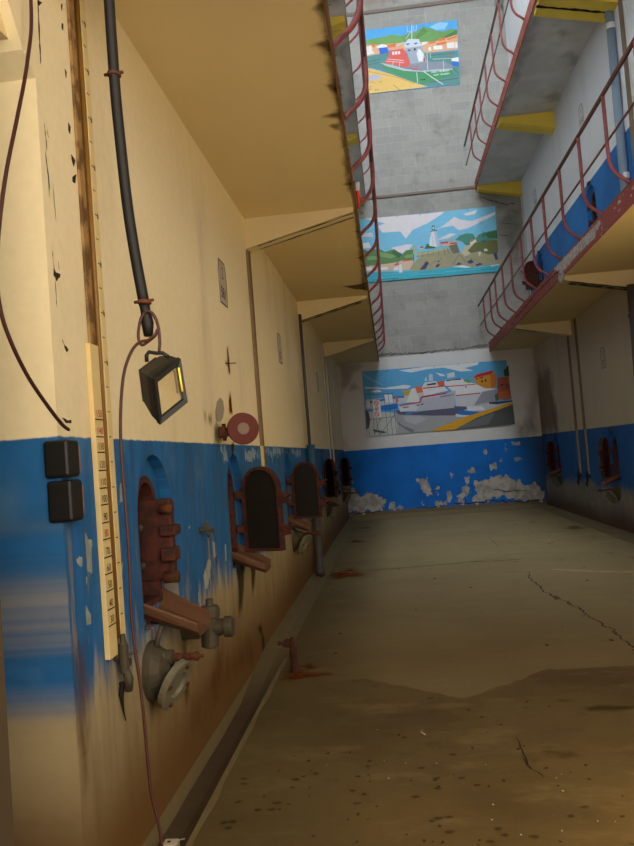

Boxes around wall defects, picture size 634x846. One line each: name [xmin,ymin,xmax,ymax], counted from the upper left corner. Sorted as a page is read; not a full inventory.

peeling [348,481,403,515]
peeling [416,442,545,508]
crack [348,540,634,651]
crack [516,737,543,776]